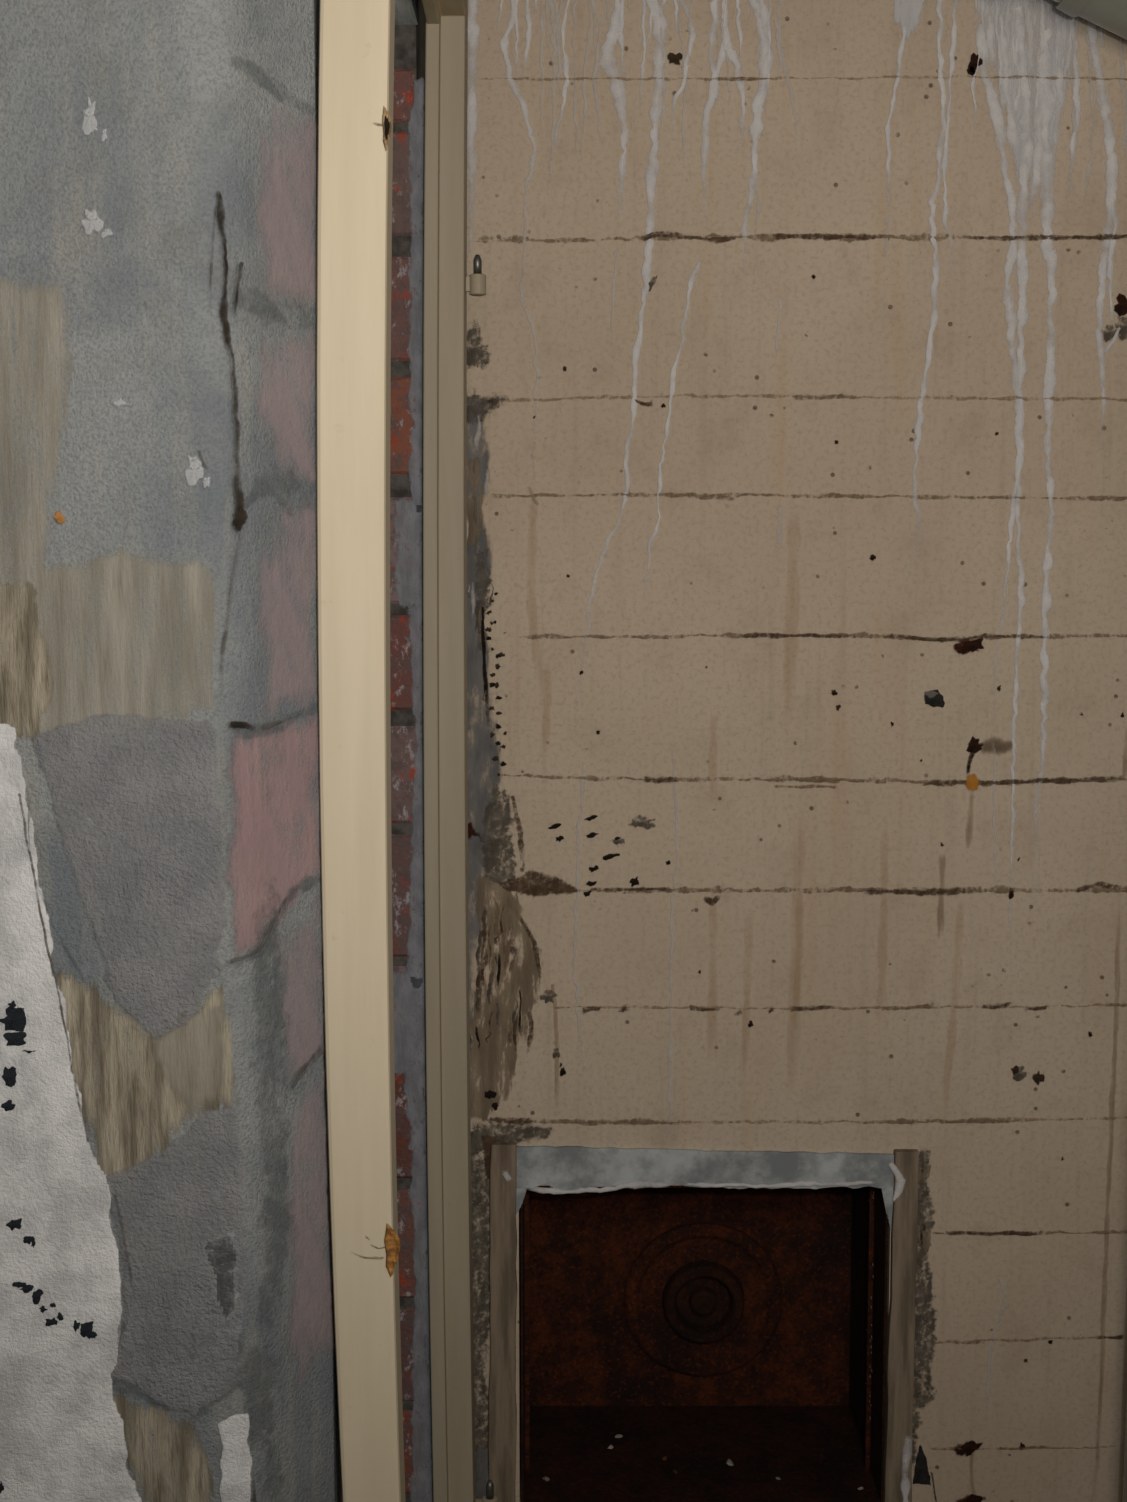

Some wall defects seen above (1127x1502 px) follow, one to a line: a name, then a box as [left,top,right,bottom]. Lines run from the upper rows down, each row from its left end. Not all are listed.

crack [198,191,247,654]
efflorescence [467,0,480,211]
efflorescence [498,0,797,633]
efflorescence [885,0,1127,877]
peeling [0,724,240,1502]
spalling [467,395,655,1499]
peeling [218,1414,252,1502]